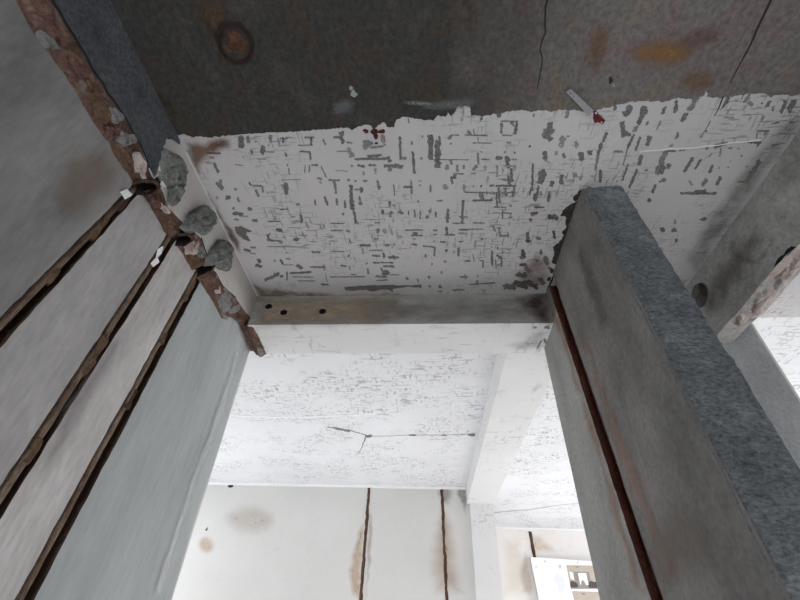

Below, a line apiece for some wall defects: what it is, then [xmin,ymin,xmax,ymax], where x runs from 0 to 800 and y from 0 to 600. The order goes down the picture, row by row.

crack [537,0,548,90]
crack [699,0,772,138]
peeling [15,0,800,357]
rust [88,215,110,242]
crack [328,427,373,454]